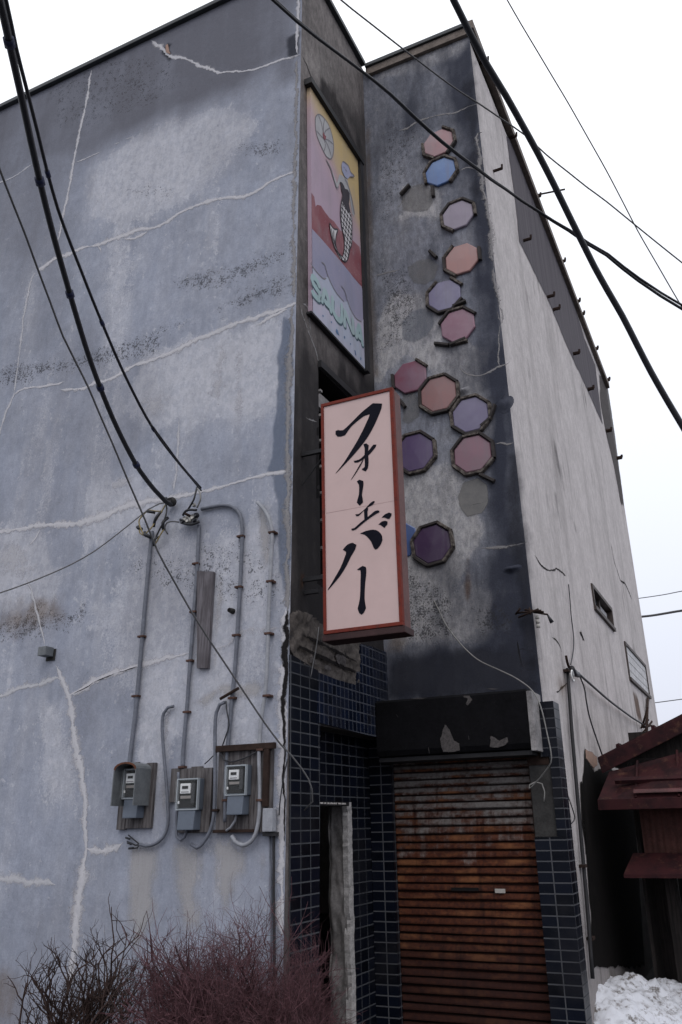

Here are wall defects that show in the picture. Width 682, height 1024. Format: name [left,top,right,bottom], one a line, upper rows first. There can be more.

crack [152,41,311,76]
crack [0,70,318,434]
crack [0,421,290,543]
spalling [274,305,361,936]
damp [388,461,536,696]
crack [0,653,189,980]
peeling [440,725,460,752]
peeling [490,736,508,748]